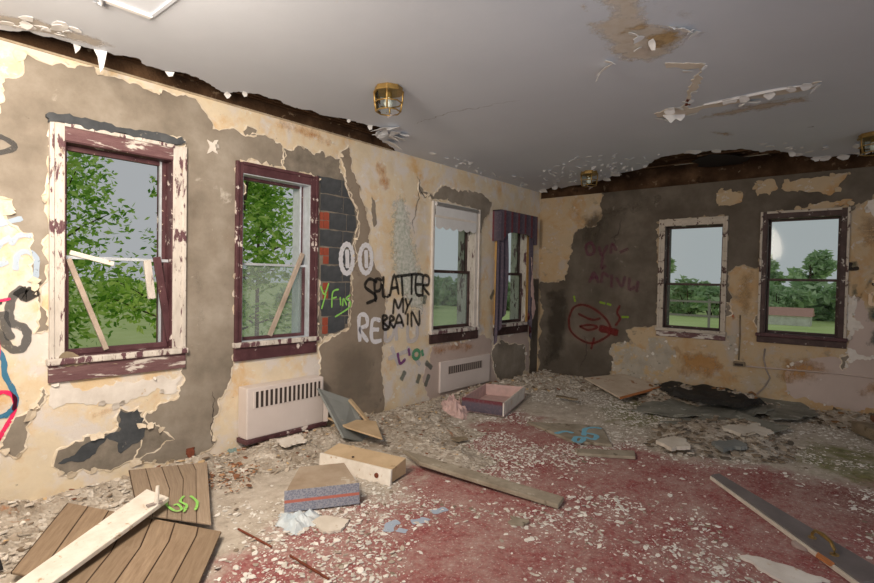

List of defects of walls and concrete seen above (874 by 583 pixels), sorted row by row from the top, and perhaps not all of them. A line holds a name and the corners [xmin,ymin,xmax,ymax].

spalling [0,16,388,479]
peeling [368,125,409,150]
spalling [417,141,874,412]
peeling [654,62,822,123]